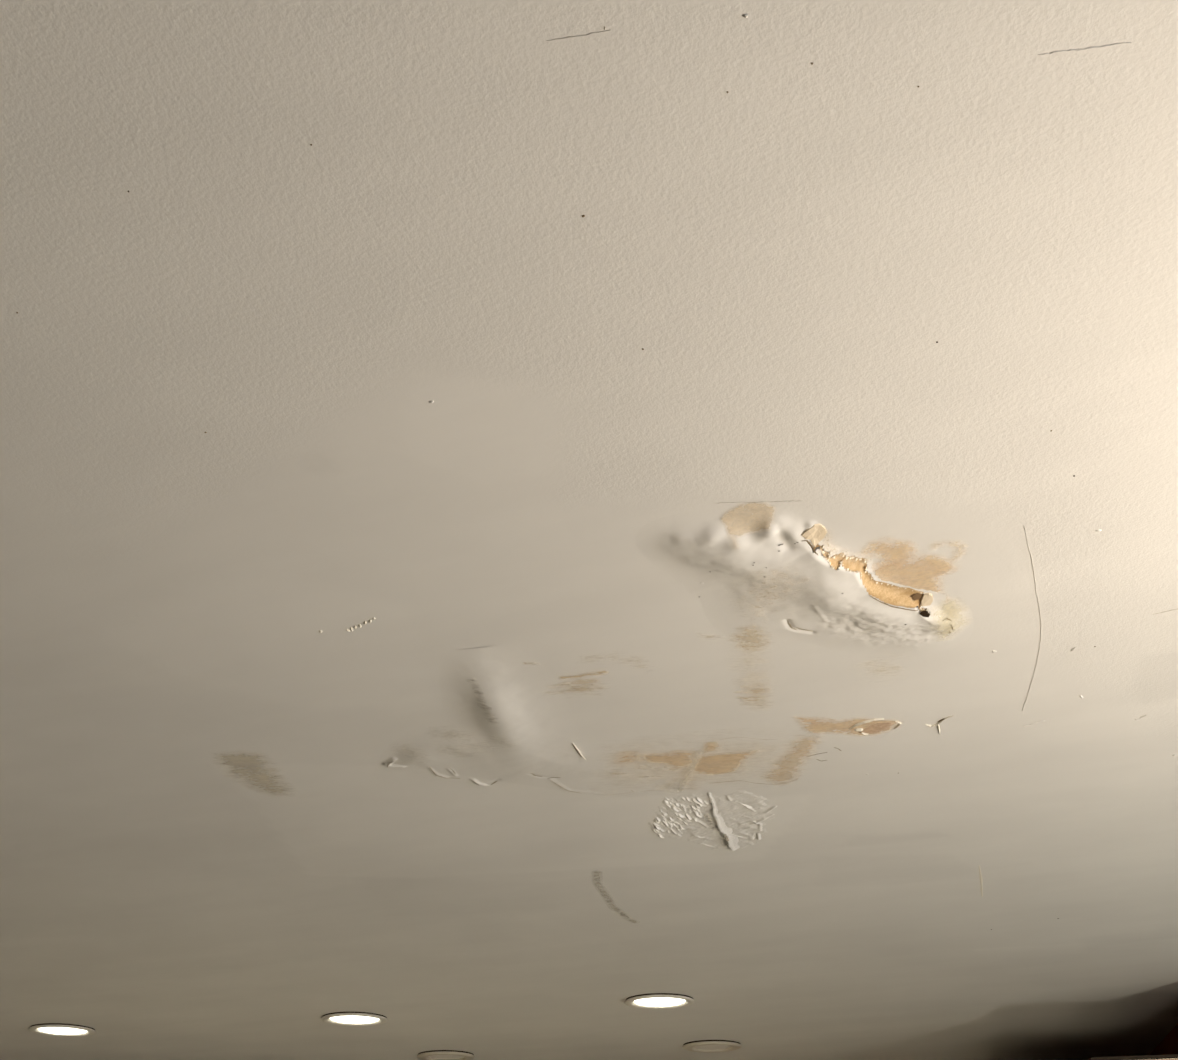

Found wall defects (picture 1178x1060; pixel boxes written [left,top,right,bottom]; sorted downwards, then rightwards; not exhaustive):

spalling [912,593,930,617]
flaking render [644,791,777,852]